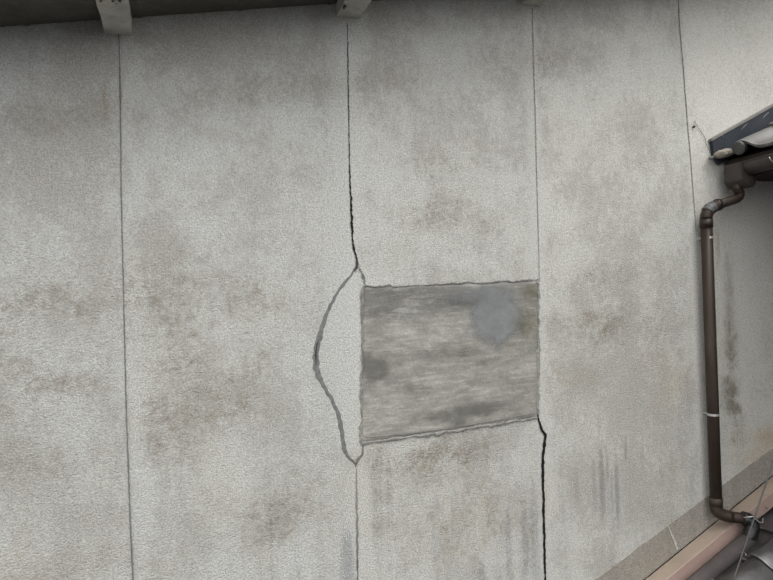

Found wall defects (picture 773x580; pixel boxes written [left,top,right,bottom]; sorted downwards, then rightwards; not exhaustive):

crack [312,24,367,580]
crack [537,415,547,580]